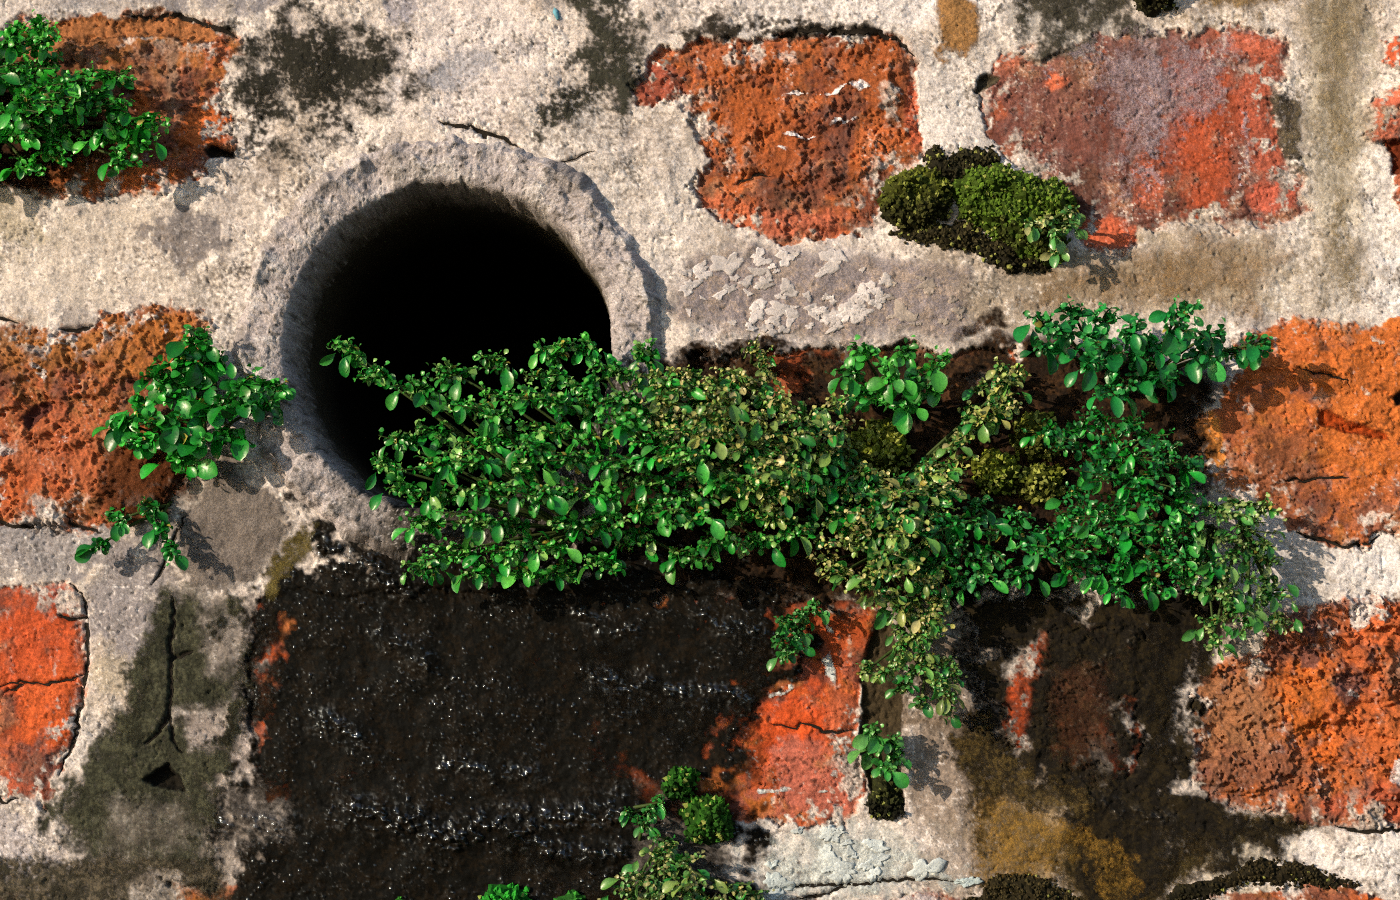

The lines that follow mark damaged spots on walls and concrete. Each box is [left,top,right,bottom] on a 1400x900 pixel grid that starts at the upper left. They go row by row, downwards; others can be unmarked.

water stain [222,0,433,162]
water stain [533,0,661,142]
spalling [975,74,1000,93]
water stain [37,774,81,835]
water stain [70,448,835,900]
water stain [939,568,1320,900]